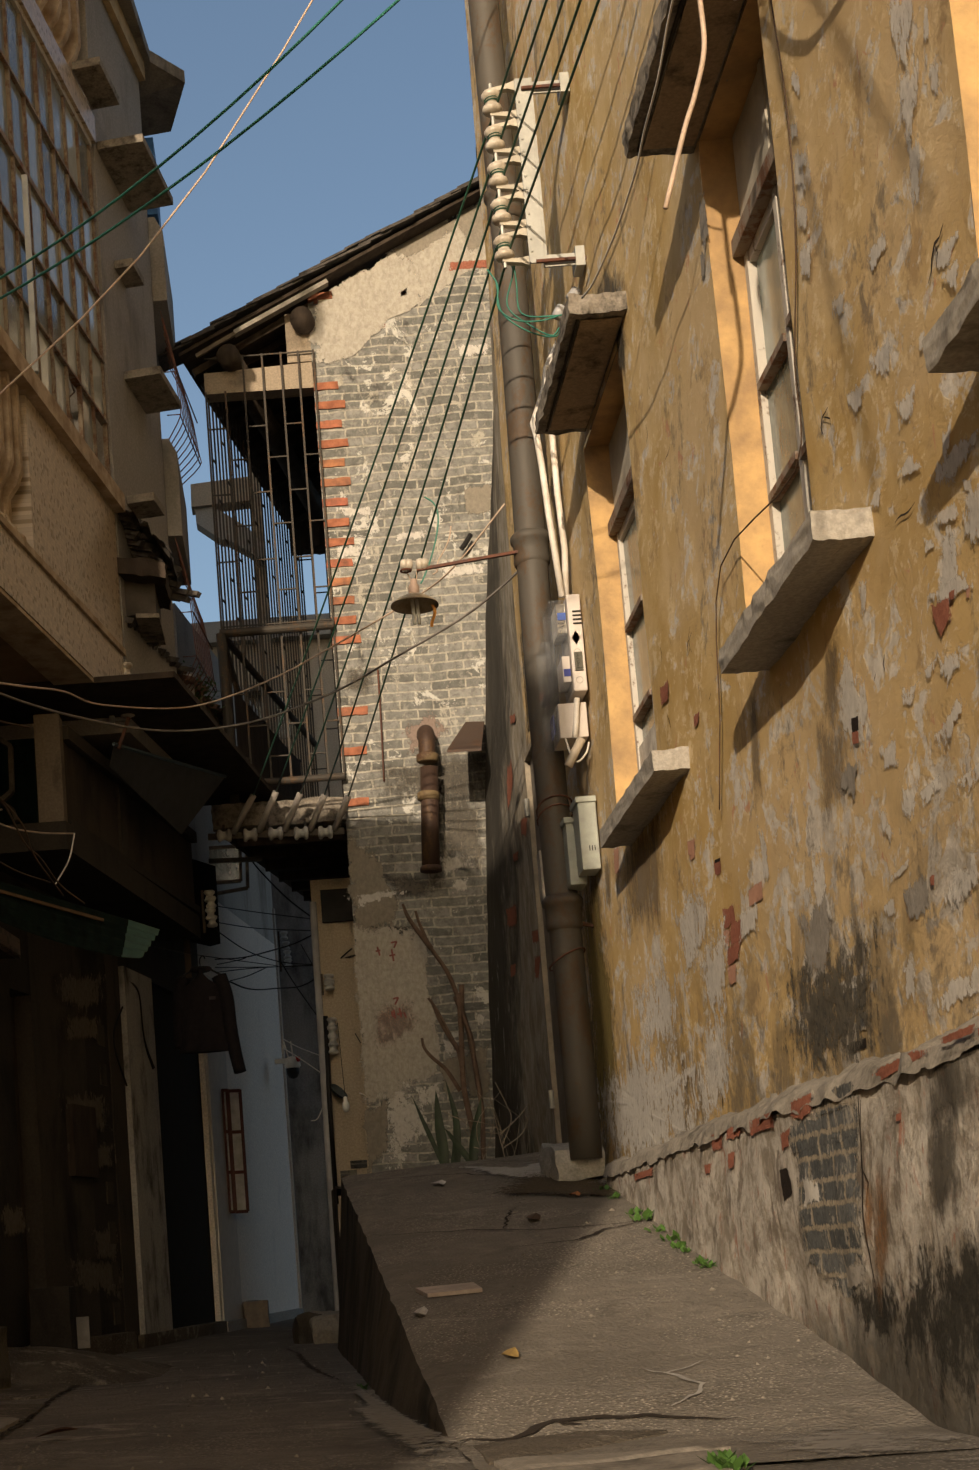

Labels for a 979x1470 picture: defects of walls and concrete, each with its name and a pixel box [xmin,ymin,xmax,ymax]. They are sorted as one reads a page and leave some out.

peeling [459,343,489,357]
peeling [329,544,370,559]
peeling [335,506,373,517]
peeling [396,529,427,541]
peeling [440,562,487,579]
peeling [878,421,979,843]
peeling [835,647,898,800]
flaking render [597,826,979,1308]
leakage [927,1050,970,1213]
leakage [739,1228,979,1461]
crack [0,1385,80,1437]
crack [449,1359,738,1470]